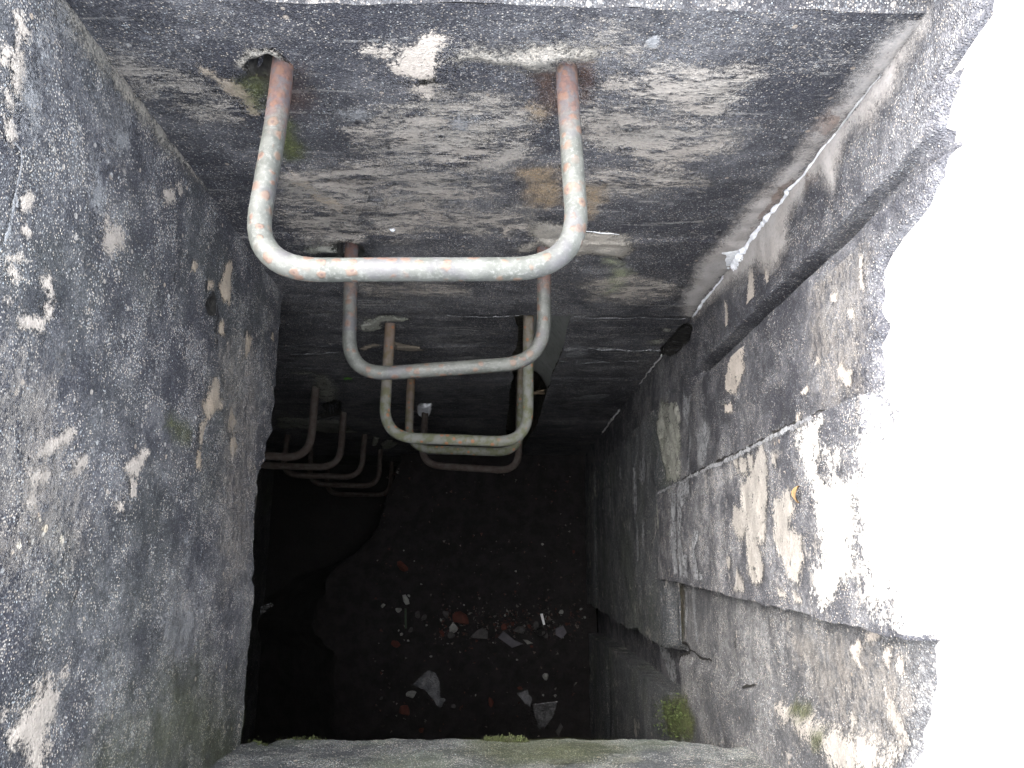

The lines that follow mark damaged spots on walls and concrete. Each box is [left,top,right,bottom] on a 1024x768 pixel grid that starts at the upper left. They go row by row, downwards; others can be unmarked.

damp [645,35,660,48]
damp [22,70,41,150]
damp [109,70,207,189]
damp [284,122,303,160]
spalling [275,30,540,256]
corrosion [519,167,563,206]
damp [682,74,882,319]
spalling [196,378,238,471]
damp [416,403,432,418]
damp [561,346,662,384]
spalling [725,347,745,413]
spalling [726,367,983,676]